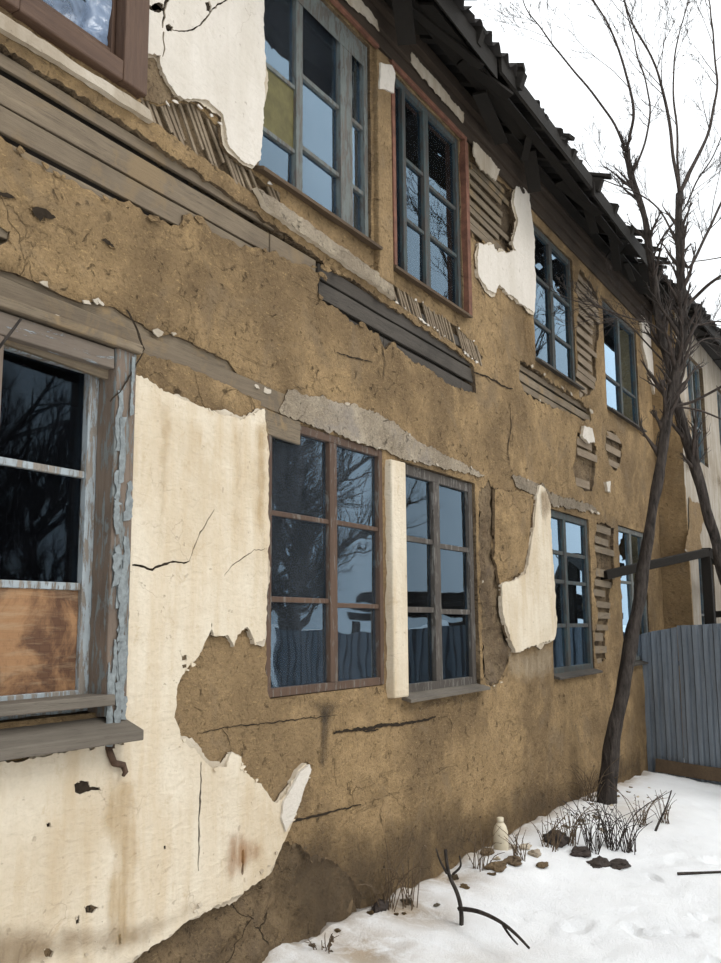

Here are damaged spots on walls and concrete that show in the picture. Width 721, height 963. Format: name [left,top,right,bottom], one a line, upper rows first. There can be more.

crack [149,0,226,32]
peeling [0,53,482,392]
flaking render [519,273,621,491]
crack [132,527,204,571]
peeling [106,353,271,724]
crack [203,715,436,744]
flaking render [74,781,102,794]
crack [195,764,203,854]
flaking render [133,635,361,963]
crack [293,804,361,822]